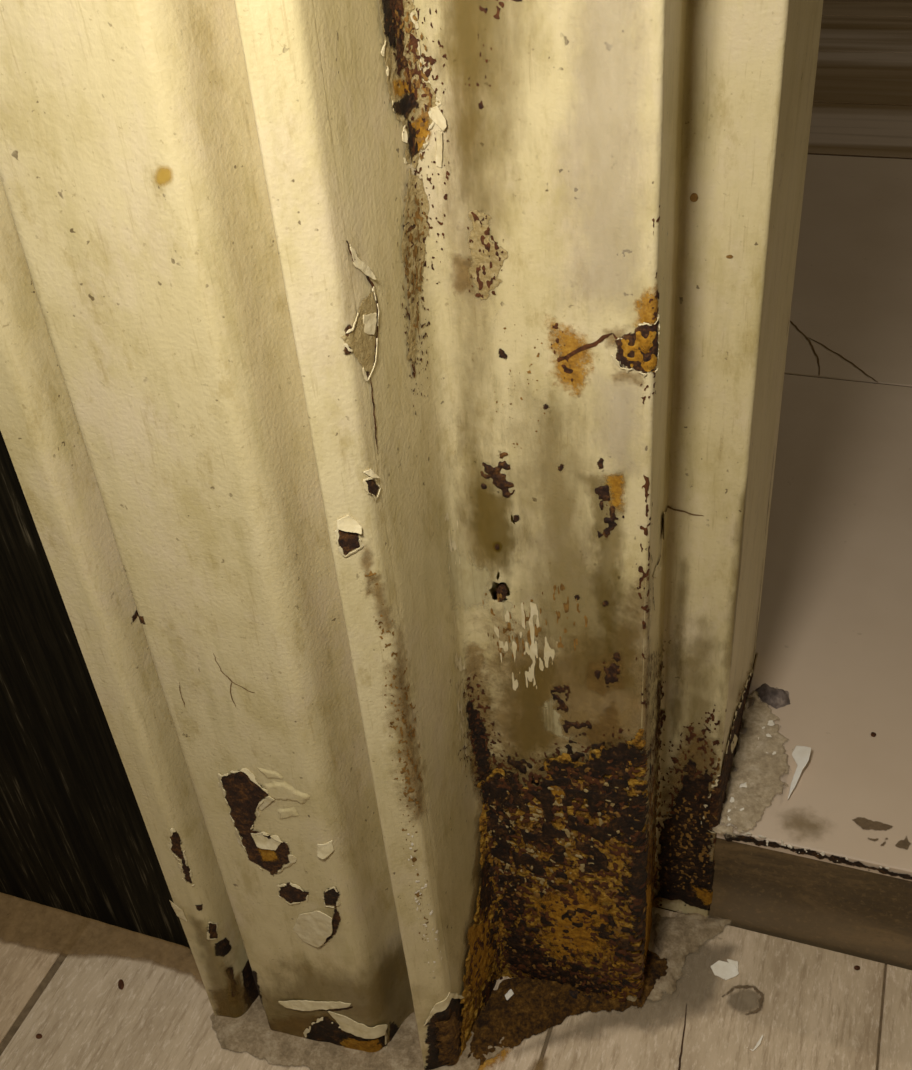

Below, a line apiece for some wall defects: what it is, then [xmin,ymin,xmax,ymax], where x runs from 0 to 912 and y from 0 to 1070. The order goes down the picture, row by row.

rust [379,0,447,168]
peeling [341,241,380,454]
rust [550,284,661,404]
crack [790,321,878,382]
peeling [335,514,370,568]
rust [480,452,515,498]
rust [595,458,625,538]
spalling [713,690,912,880]
peeling [218,768,341,948]
rust [424,628,753,1070]
peeling [268,1000,388,1053]
crack [678,1005,687,1070]